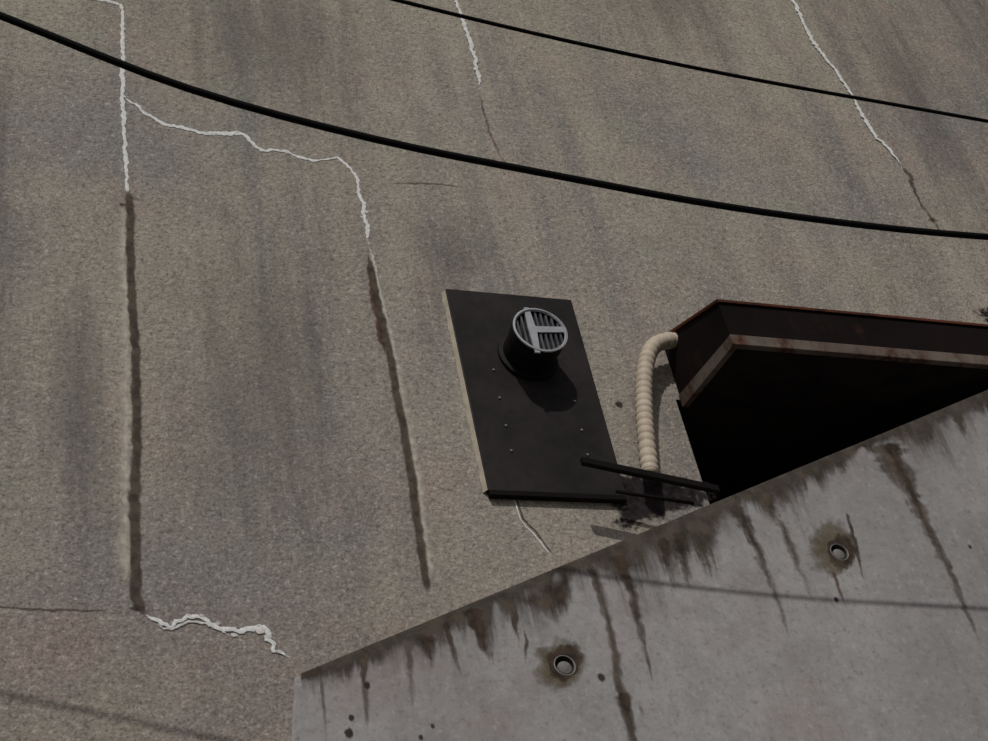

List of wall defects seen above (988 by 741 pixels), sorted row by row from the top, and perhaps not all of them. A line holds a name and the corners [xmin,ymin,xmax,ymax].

crack [97,0,387,316]
crack [455,0,481,85]
crack [791,0,939,229]
crack [0,605,93,613]
crack [146,614,295,659]
water stain [360,446,851,741]
water stain [811,515,861,596]
water stain [872,390,988,621]